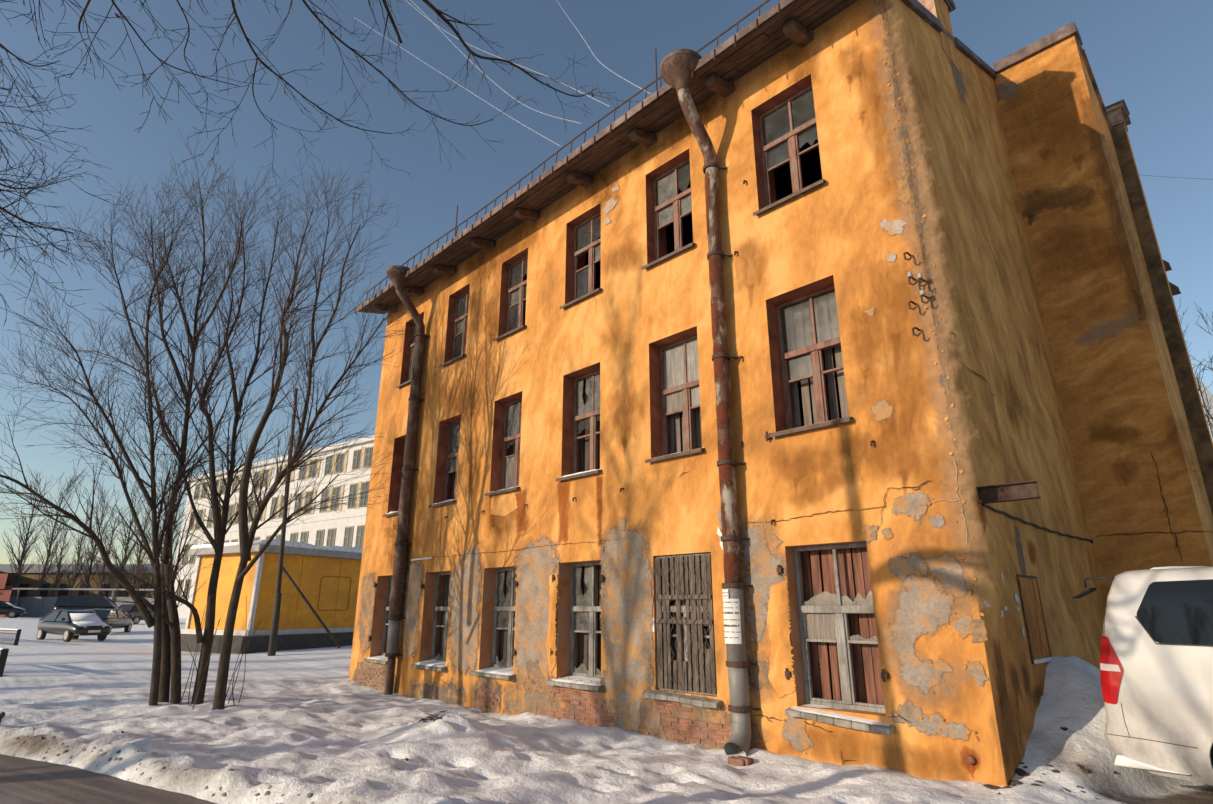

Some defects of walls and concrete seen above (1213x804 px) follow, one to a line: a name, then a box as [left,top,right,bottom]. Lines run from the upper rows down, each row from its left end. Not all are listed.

damp [996,70,1152,343]
rust [708,254,727,384]
flaking render [862,0,1020,742]
crack [1097,452,1211,560]
flaking render [352,517,767,766]
flaking render [739,521,787,697]
flaking render [782,716,813,754]